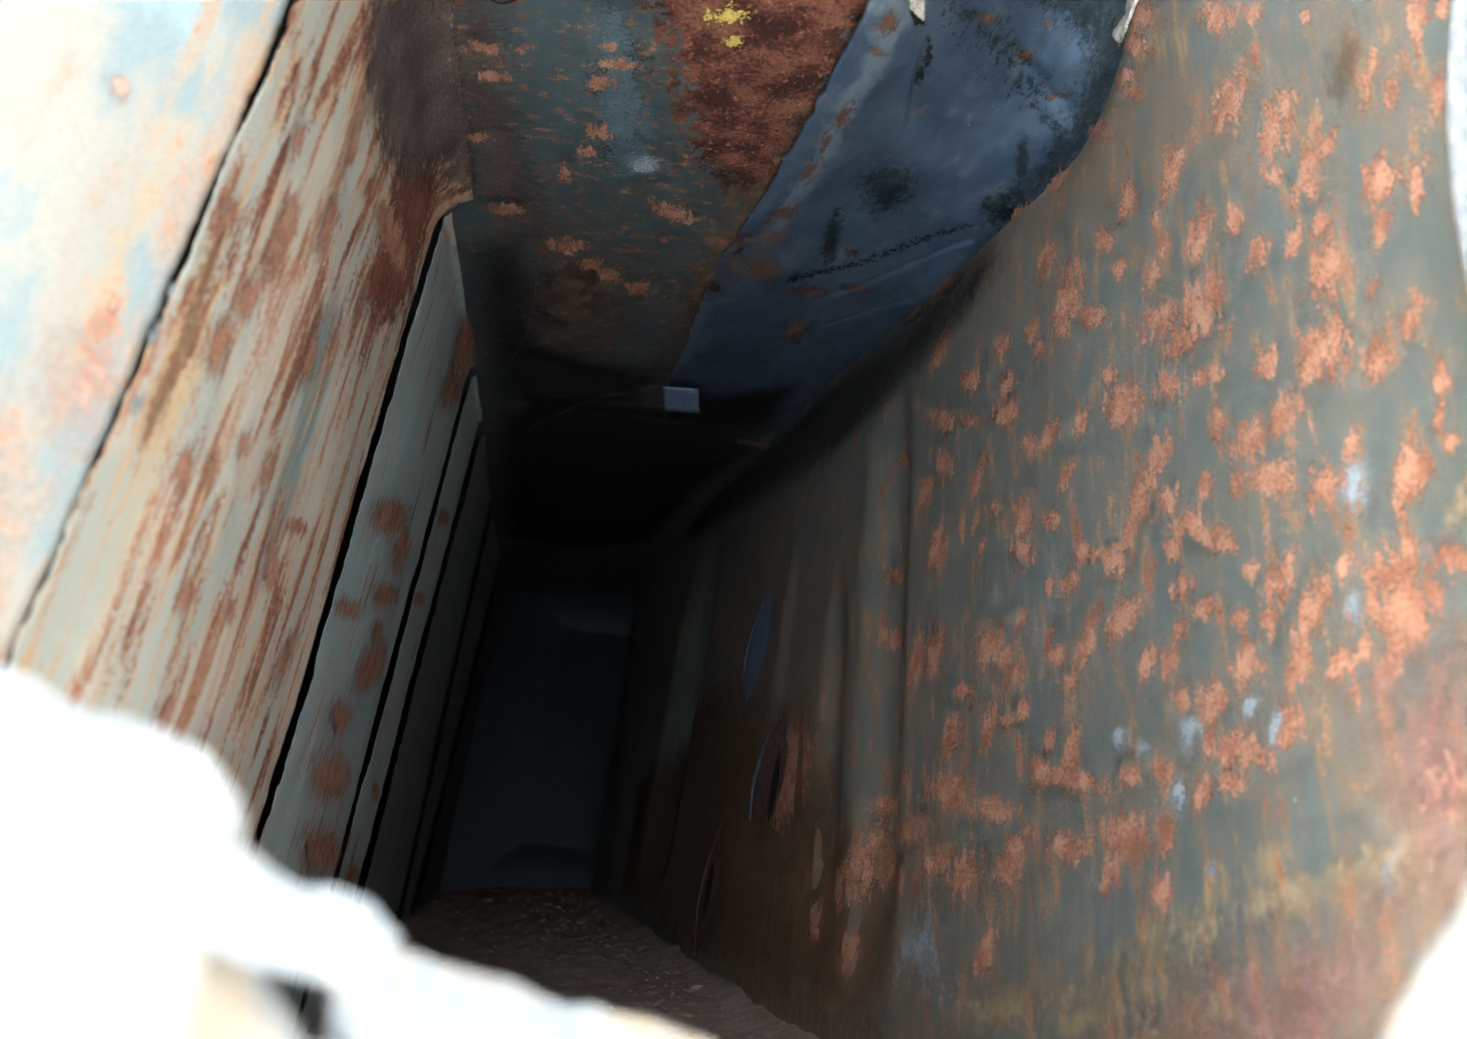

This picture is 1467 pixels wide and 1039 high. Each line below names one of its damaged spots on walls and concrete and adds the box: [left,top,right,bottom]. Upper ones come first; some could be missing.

rust [556,121,614,182]
rust [200,0,514,394]
rust [478,202,532,217]
rust [541,234,655,299]
rust [438,301,477,415]
rust [164,429,282,509]
rust [586,0,1467,1029]
rust [173,564,203,623]
rust [261,515,313,698]
rust [155,690,177,731]
rust [292,489,426,890]